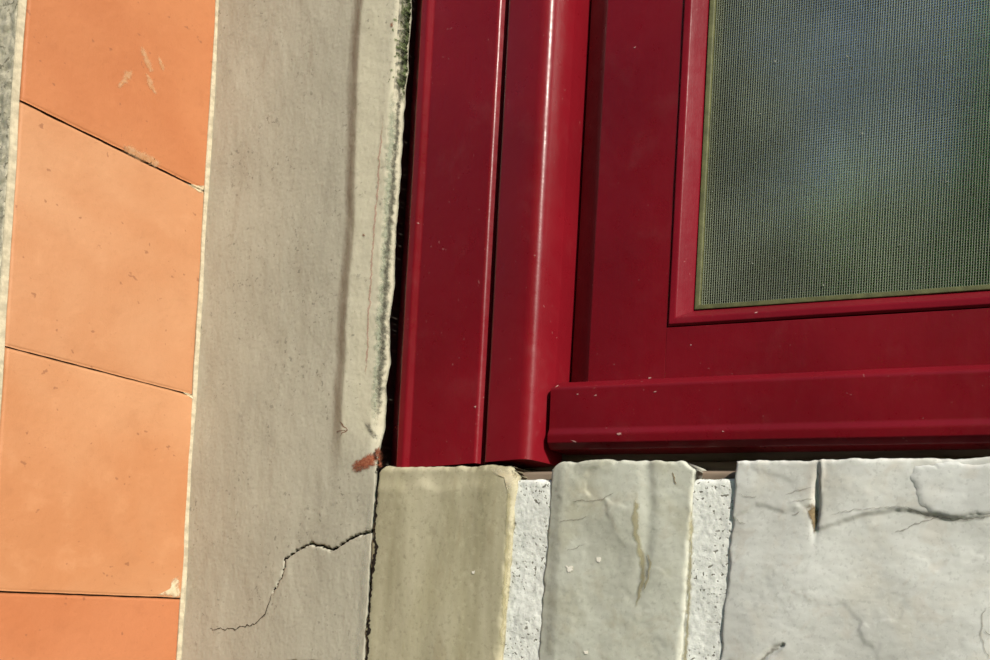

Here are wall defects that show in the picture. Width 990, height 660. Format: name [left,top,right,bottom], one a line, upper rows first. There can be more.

leakage [377,51,404,403]
crack [210,468,381,660]